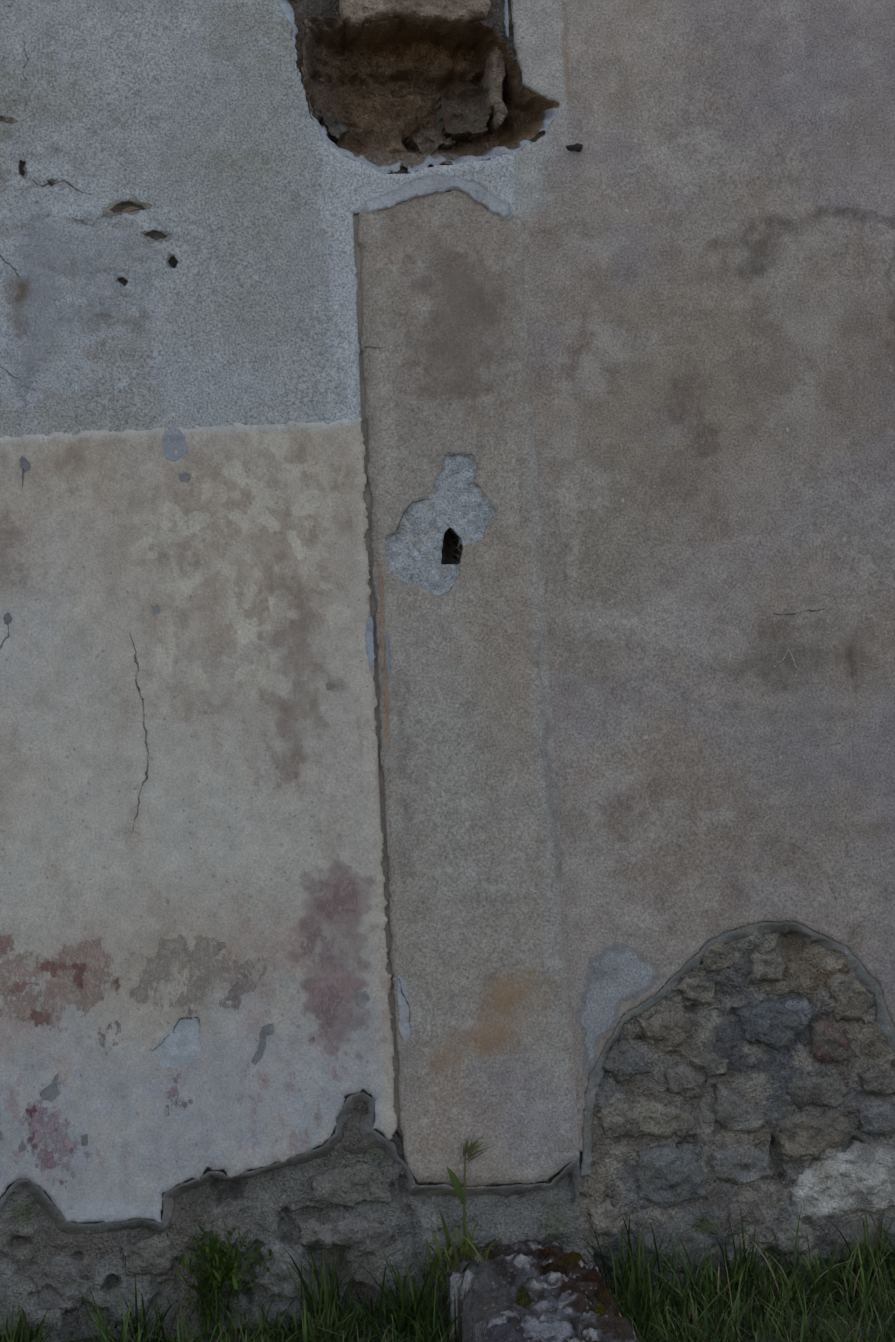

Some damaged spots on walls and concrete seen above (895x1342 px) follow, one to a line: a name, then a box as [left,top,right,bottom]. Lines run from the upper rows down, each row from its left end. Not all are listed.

spalling [19,160,27,179]
spalling [277,0,559,174]
spalling [385,452,497,597]
crack [131,638,149,819]
spalling [0,921,895,1342]